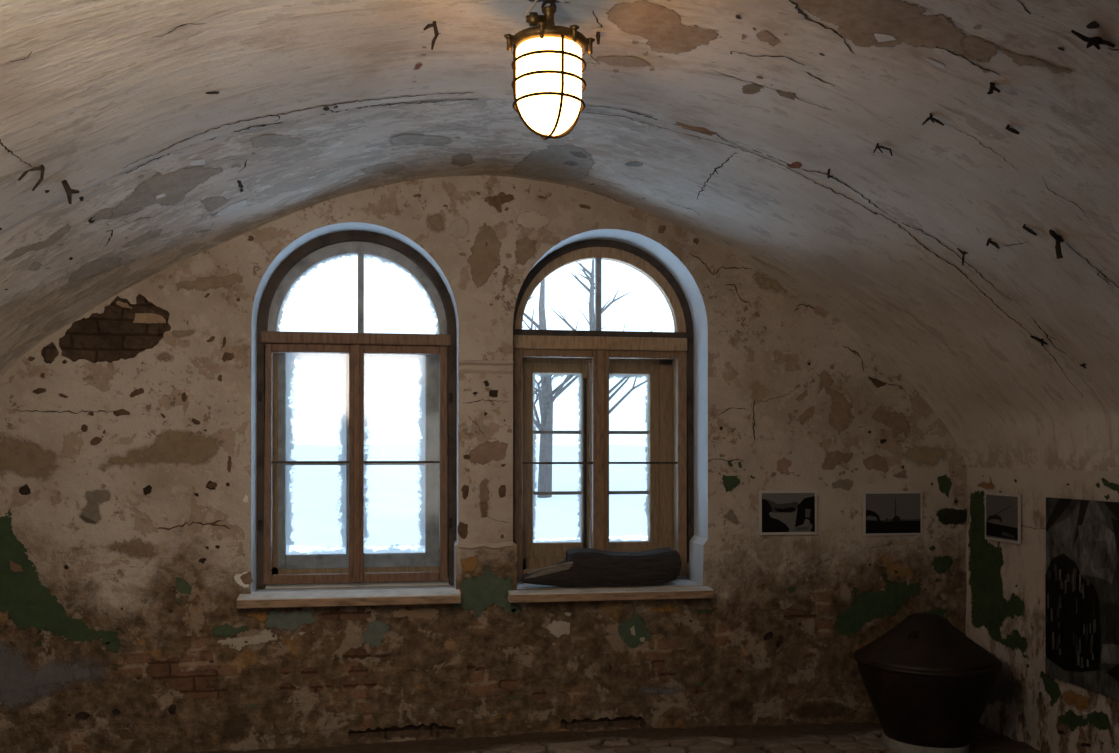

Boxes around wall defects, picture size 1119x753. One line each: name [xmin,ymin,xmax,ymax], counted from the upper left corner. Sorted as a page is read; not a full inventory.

flaking render [596,0,718,73]
flaking render [794,0,1072,74]
crack [0,123,36,168]
flaking render [88,159,248,233]
crack [585,106,1087,396]
crack [1067,244,1119,288]
flaking render [28,294,194,398]
spalling [113,388,144,417]
peeling [794,362,911,491]
spalling [194,456,232,497]
peeling [0,504,126,653]
peeling [931,471,1112,747]